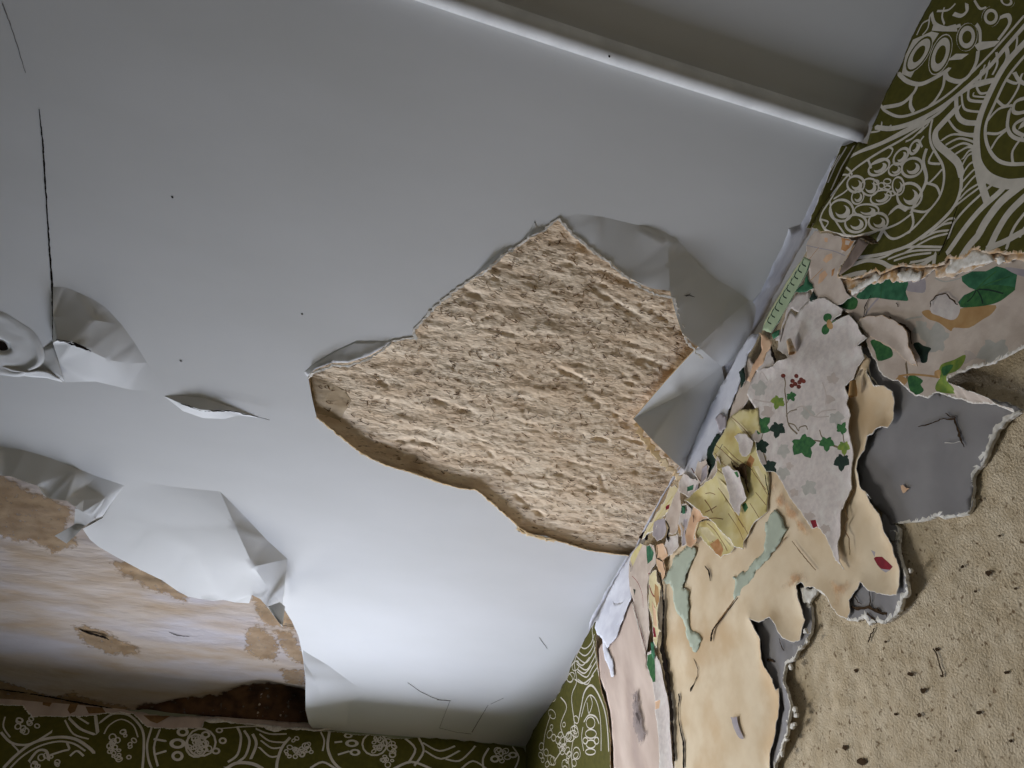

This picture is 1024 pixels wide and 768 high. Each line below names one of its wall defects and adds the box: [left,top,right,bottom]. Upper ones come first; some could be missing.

crack [39,109,53,340]
flaking render [0,699,313,729]
flaking render [599,599,659,768]
peeling [664,546,702,652]
peeling [733,510,787,600]
flaking render [753,347,1024,768]